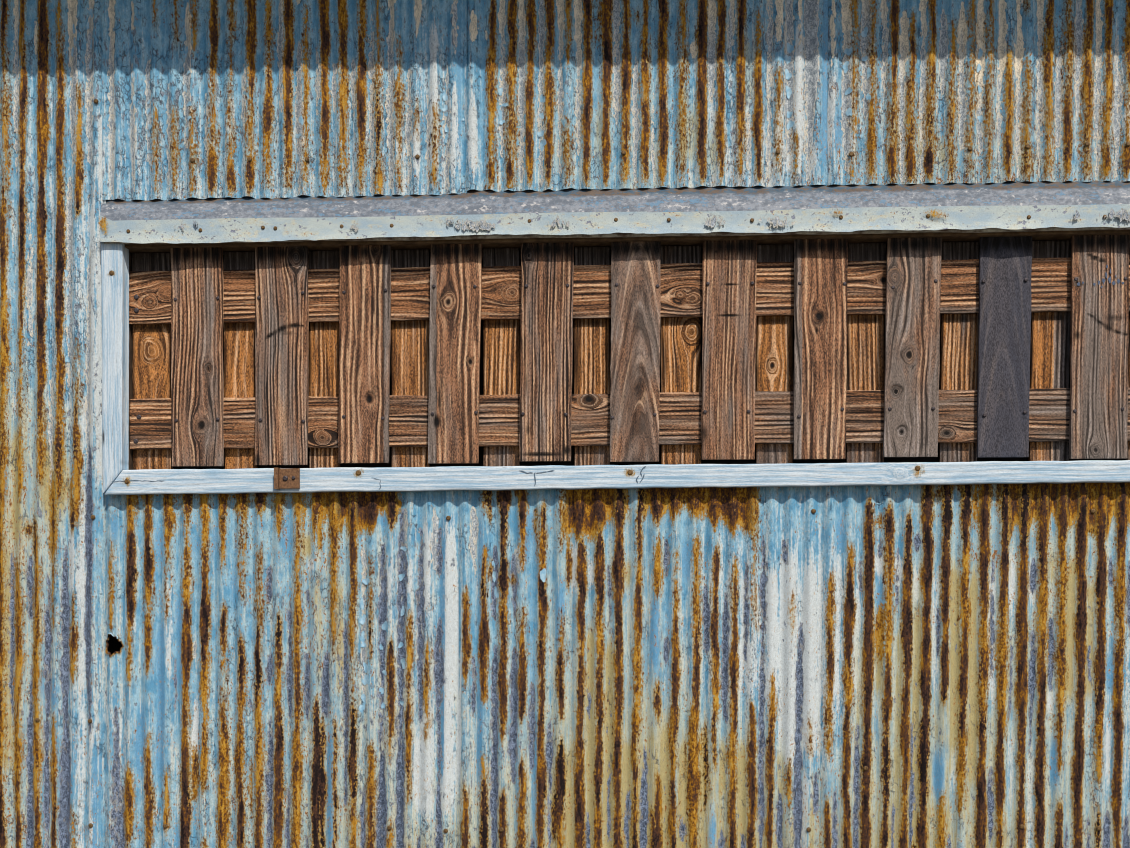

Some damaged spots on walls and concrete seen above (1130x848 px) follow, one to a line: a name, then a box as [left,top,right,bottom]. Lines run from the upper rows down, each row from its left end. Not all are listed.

rust [150,0,444,198]
rust [483,0,804,189]
rust [846,0,1130,184]
rust [0,0,87,848]
rust [107,477,434,848]
rust [460,469,793,848]
rust [806,469,1130,848]